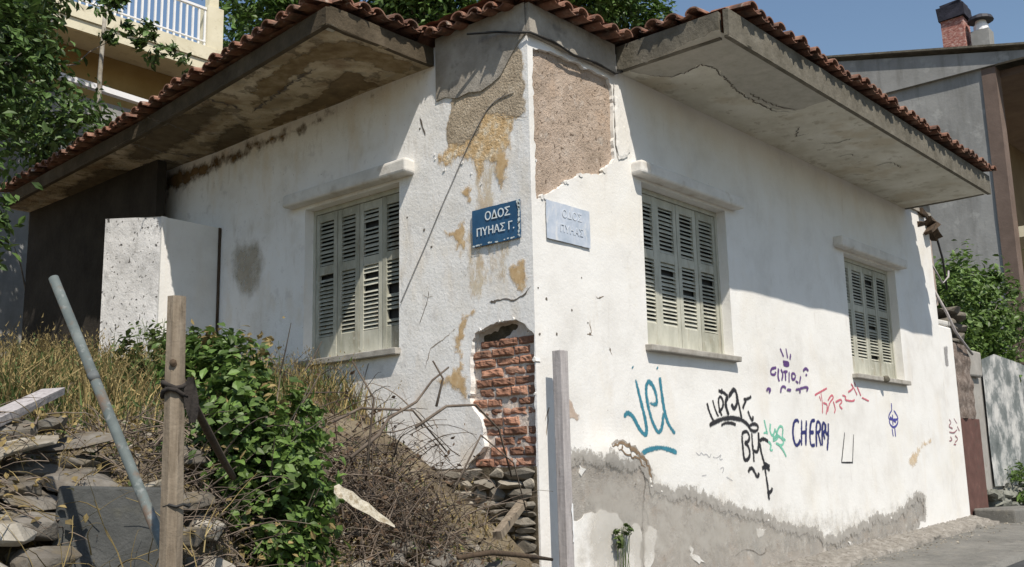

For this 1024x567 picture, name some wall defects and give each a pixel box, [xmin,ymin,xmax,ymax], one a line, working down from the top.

leakage [215,124,252,153]
spalling [434,47,631,202]
crack [651,64,899,167]
peeling [445,223,465,249]
peeling [509,259,525,290]
flaking render [439,310,541,468]
peeling [571,447,926,567]